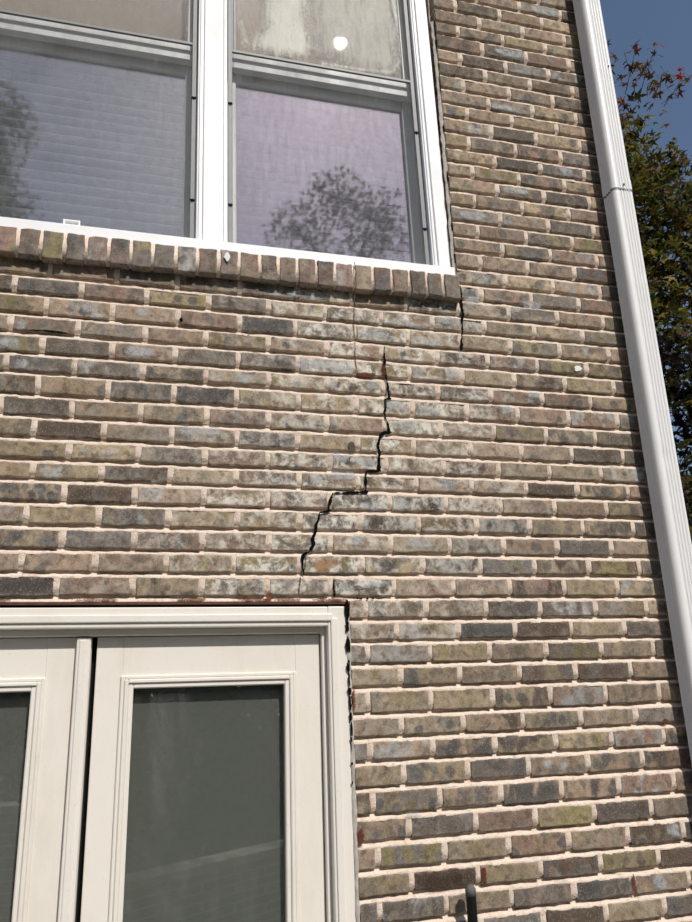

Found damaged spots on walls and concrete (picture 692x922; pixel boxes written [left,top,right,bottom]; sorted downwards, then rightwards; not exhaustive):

crack [457,281,465,351]
crack [298,346,392,594]